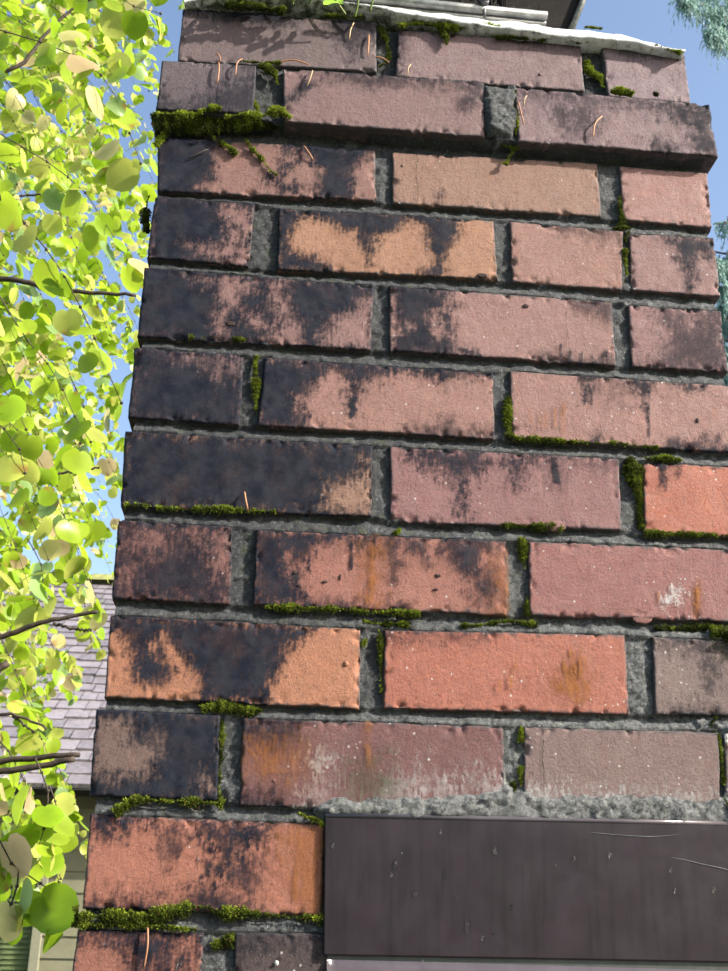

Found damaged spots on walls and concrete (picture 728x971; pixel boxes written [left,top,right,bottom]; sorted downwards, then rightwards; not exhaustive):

leakage [552,457,561,484]